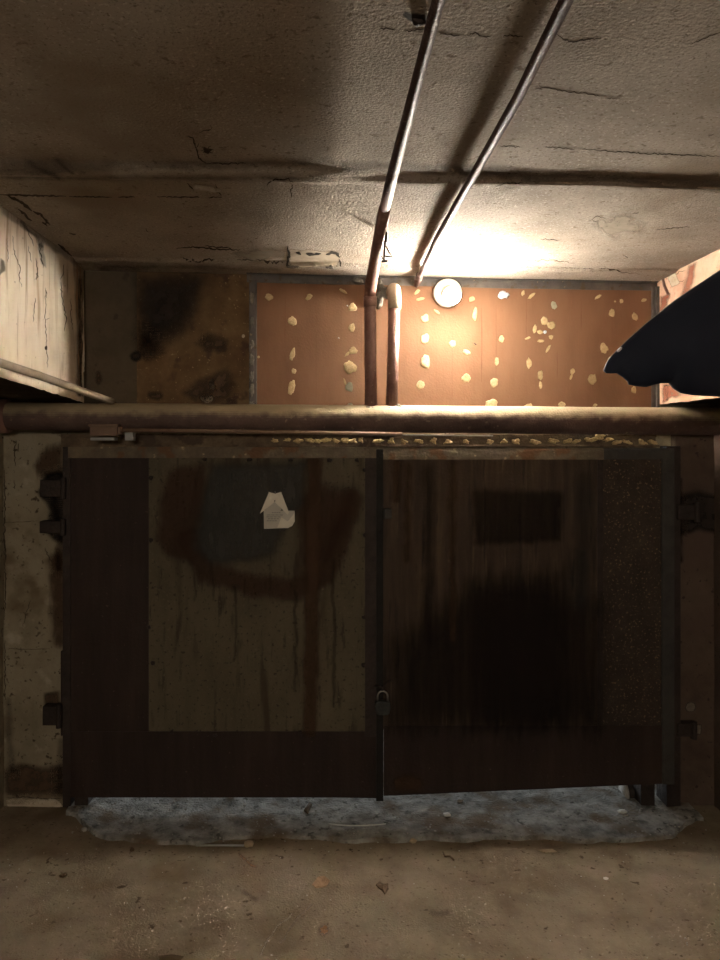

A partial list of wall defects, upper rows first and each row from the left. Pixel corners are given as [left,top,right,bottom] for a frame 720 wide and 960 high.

crack [380,27,523,38]
crack [557,34,601,43]
crack [536,87,615,99]
crack [547,134,714,157]
crack [177,245,283,264]
spalling [286,246,341,269]
crack [0,194,133,361]